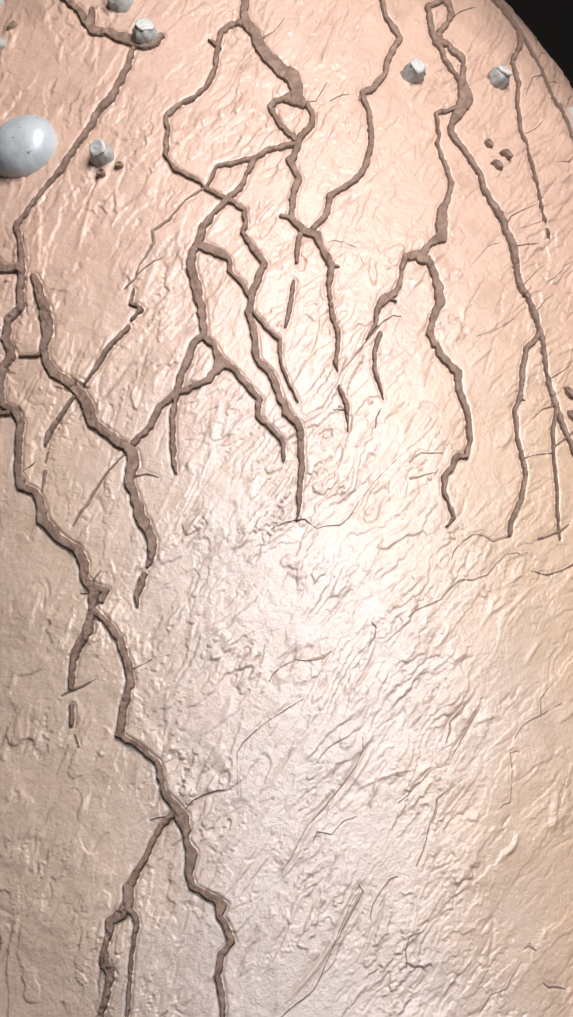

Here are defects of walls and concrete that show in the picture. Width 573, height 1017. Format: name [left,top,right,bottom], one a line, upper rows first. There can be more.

crack [342,0,573,560]
crack [0,0,403,1017]
crack [408,552,522,617]
crack [531,563,573,576]
crack [499,683,561,809]
crack [281,704,480,1017]
crack [479,943,536,1013]
crack [543,981,565,989]